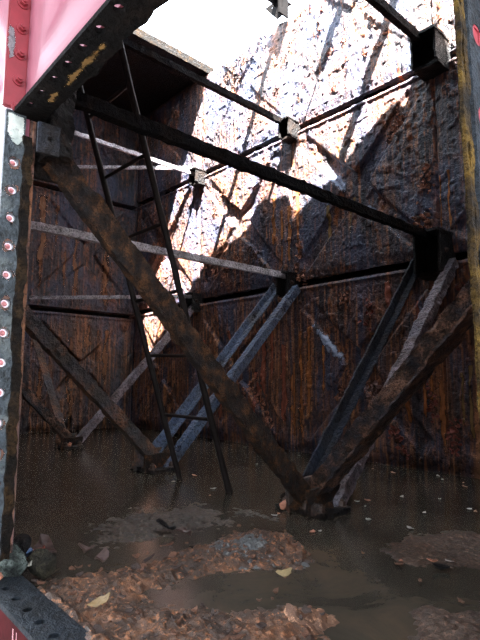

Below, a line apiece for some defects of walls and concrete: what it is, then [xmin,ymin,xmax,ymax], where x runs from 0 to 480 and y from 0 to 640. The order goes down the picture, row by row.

peeling [7,112,24,145]
rust [382,105,408,146]
rust [411,161,452,230]
rust [203,251,240,278]
leakage [312,325,345,359]